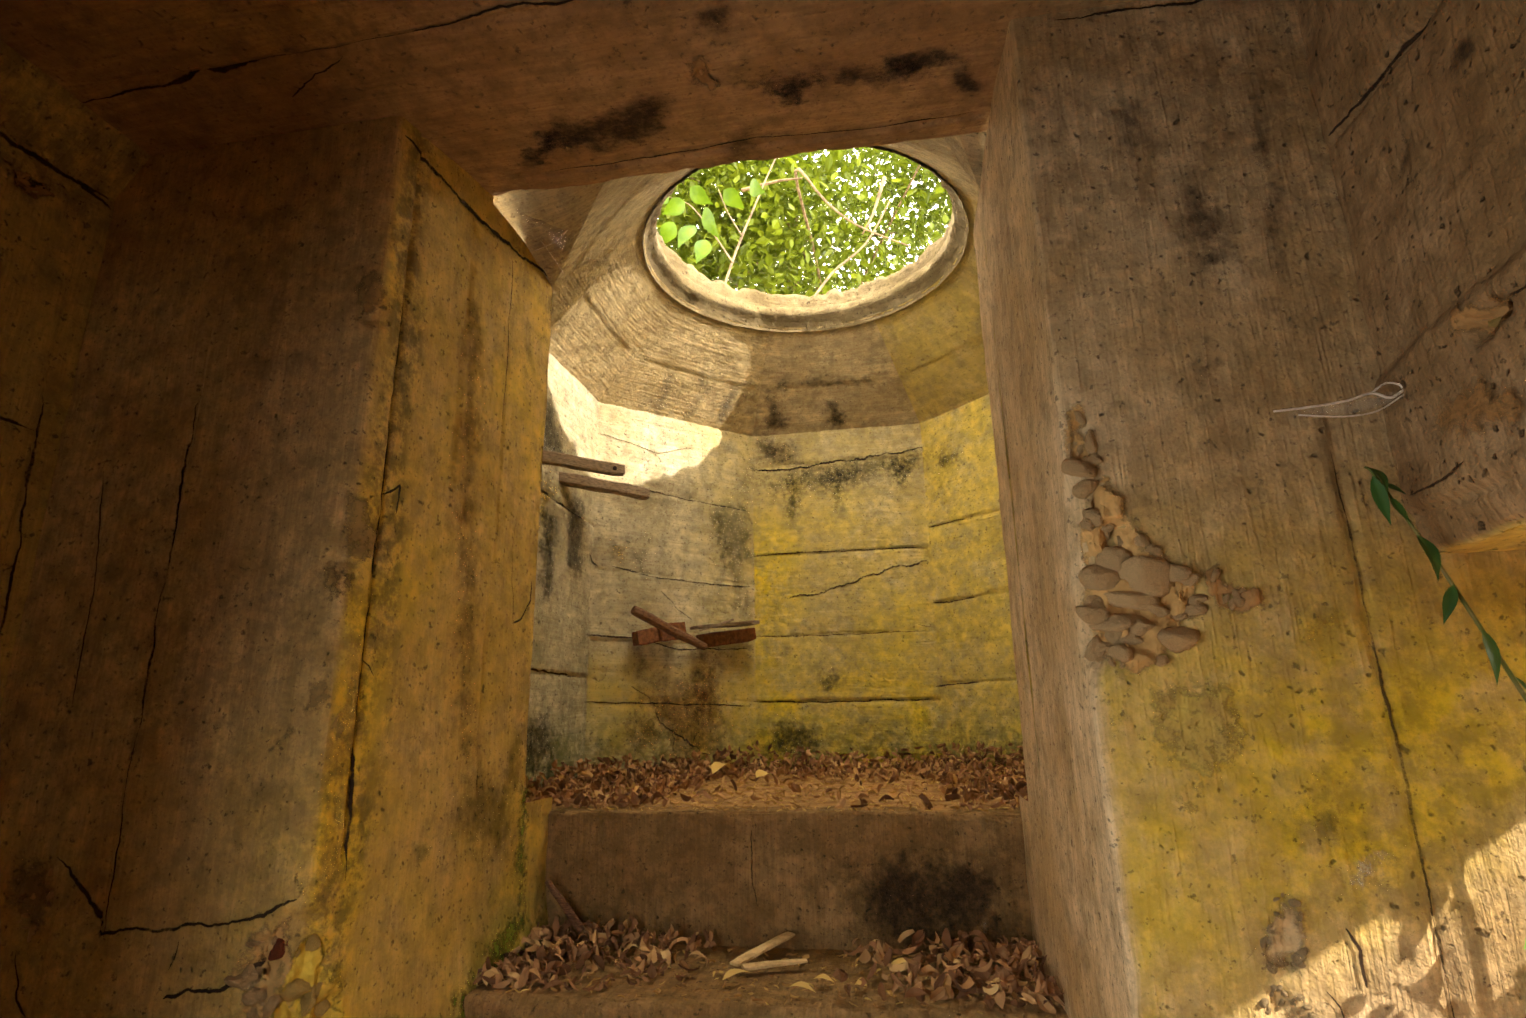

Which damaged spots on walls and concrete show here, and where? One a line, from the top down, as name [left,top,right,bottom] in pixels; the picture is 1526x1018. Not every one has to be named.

leakage [523,97,666,166]
leakage [772,51,951,105]
spalling [493,182,604,310]
leakage [544,405,563,453]
leakage [541,496,583,596]
crack [587,519,974,650]
spalling [524,334,1043,815]
spalling [1061,404,1265,674]
crack [57,403,297,999]
crack [531,668,978,755]
crack [1327,455,1455,1018]
spalling [1259,893,1318,1018]